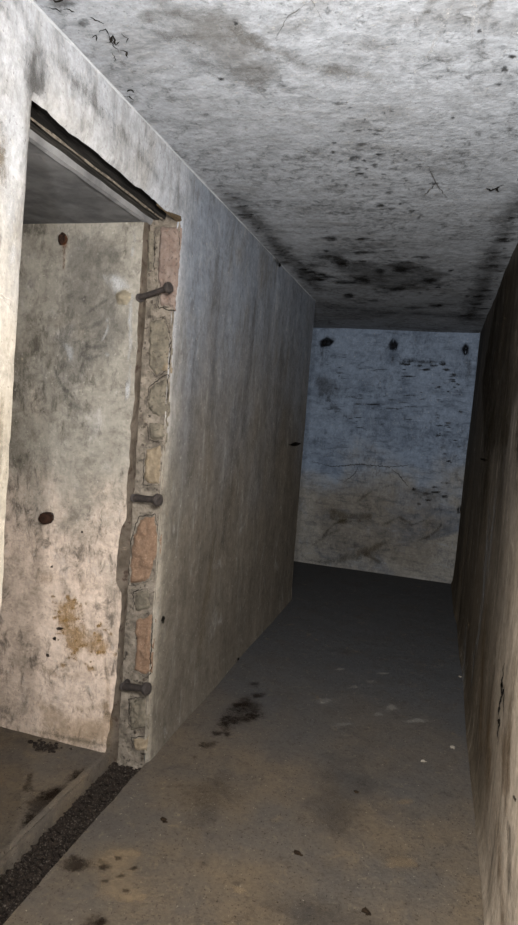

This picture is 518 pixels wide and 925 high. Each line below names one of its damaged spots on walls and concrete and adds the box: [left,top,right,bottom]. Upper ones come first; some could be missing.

damp [299,256,429,298]